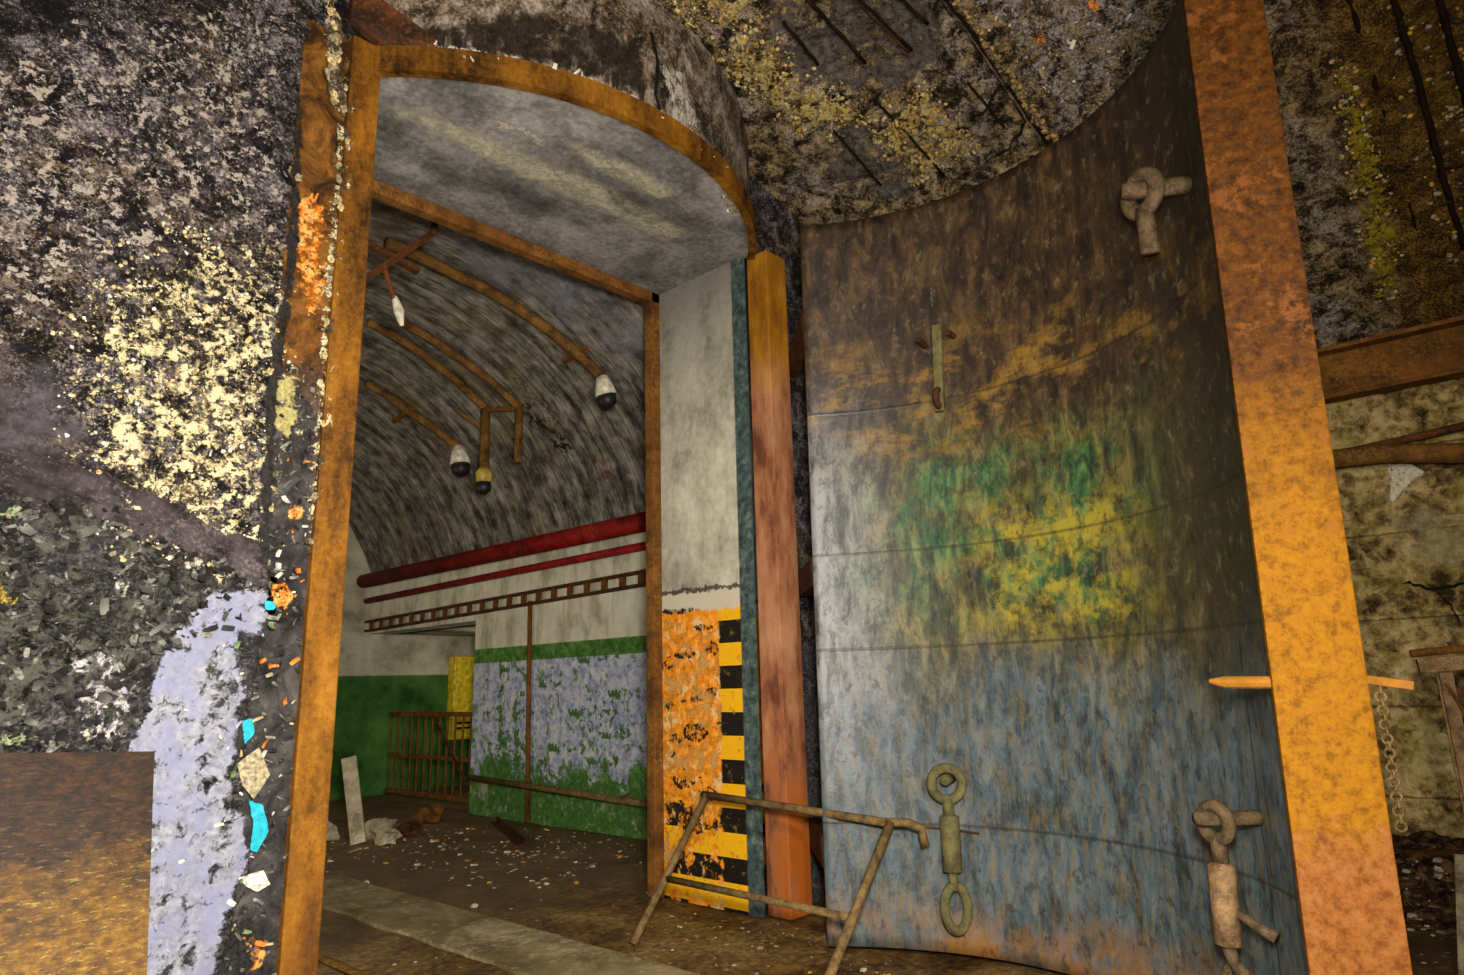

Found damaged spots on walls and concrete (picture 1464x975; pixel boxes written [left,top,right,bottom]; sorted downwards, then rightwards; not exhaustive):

peeling [481,648,645,838]
peeling [662,608,723,863]